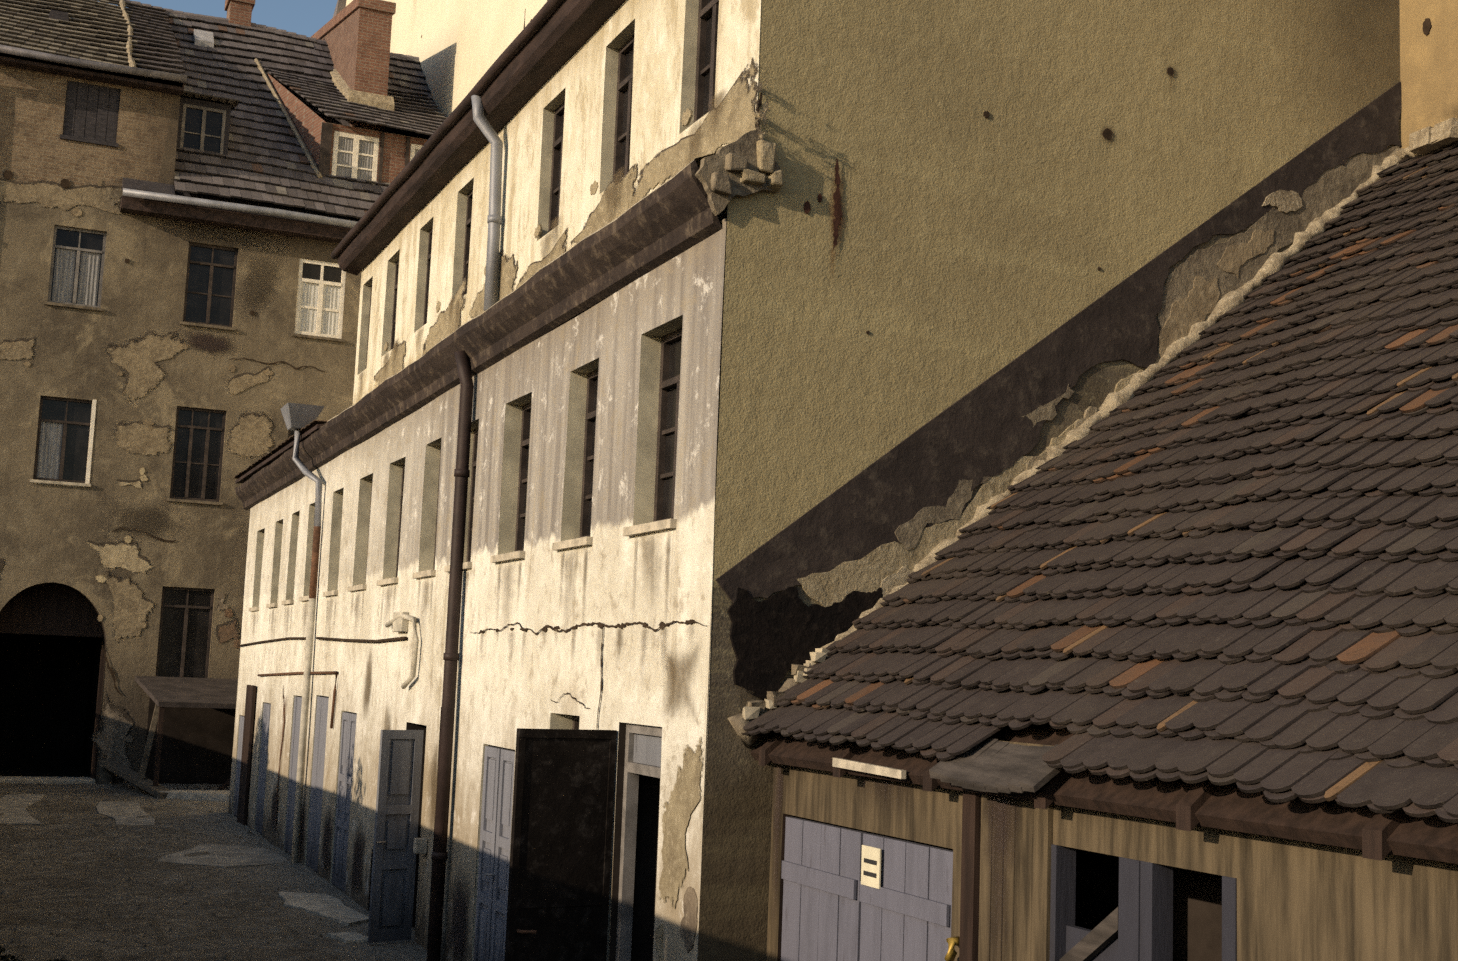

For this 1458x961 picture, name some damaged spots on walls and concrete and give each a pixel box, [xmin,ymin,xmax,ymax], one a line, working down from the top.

flaking render [0,178,124,217]
peeling [374,57,783,385]
spalling [1114,146,1400,392]
flaking render [0,336,36,367]
flaking render [103,330,189,402]
flaking render [227,364,273,395]
flaking render [115,420,174,488]
flaking render [228,411,274,457]
spalling [797,384,1097,607]
flaking render [87,535,155,639]
crack [469,619,707,727]
peeling [655,736,703,961]